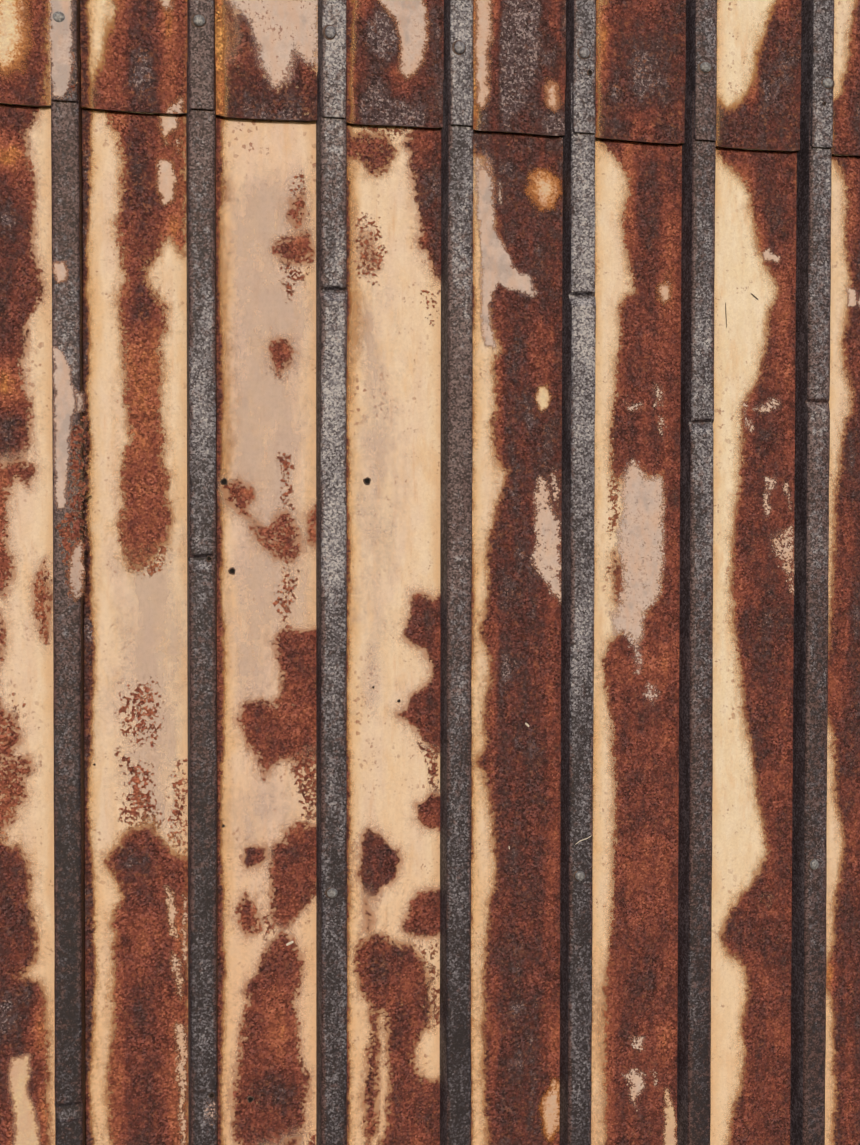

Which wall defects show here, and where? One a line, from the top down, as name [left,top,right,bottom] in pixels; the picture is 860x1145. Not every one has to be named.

corrosion [0,0,189,1145]
corrosion [215,0,317,1145]
corrosion [346,414,441,1145]
corrosion [346,0,444,400]
corrosion [471,0,566,1145]
corrosion [592,0,686,1145]
corrosion [716,0,802,1145]
corrosion [826,0,860,1145]